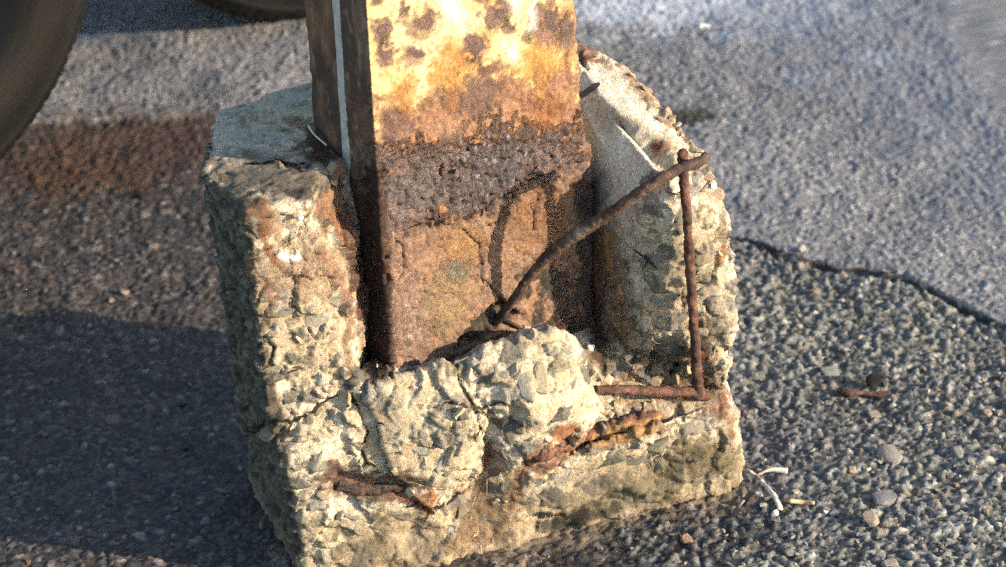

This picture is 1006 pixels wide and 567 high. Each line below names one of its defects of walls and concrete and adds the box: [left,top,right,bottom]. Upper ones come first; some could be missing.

corrosion [239,0,609,381]
crack [394,173,552,296]
crack [263,339,298,375]
corrosion [515,221,628,367]
spalling [502,215,725,442]
crack [274,386,386,473]
corrosion [317,459,436,512]
crack [403,488,467,522]
crack [434,365,518,442]
corrosion [525,416,668,474]